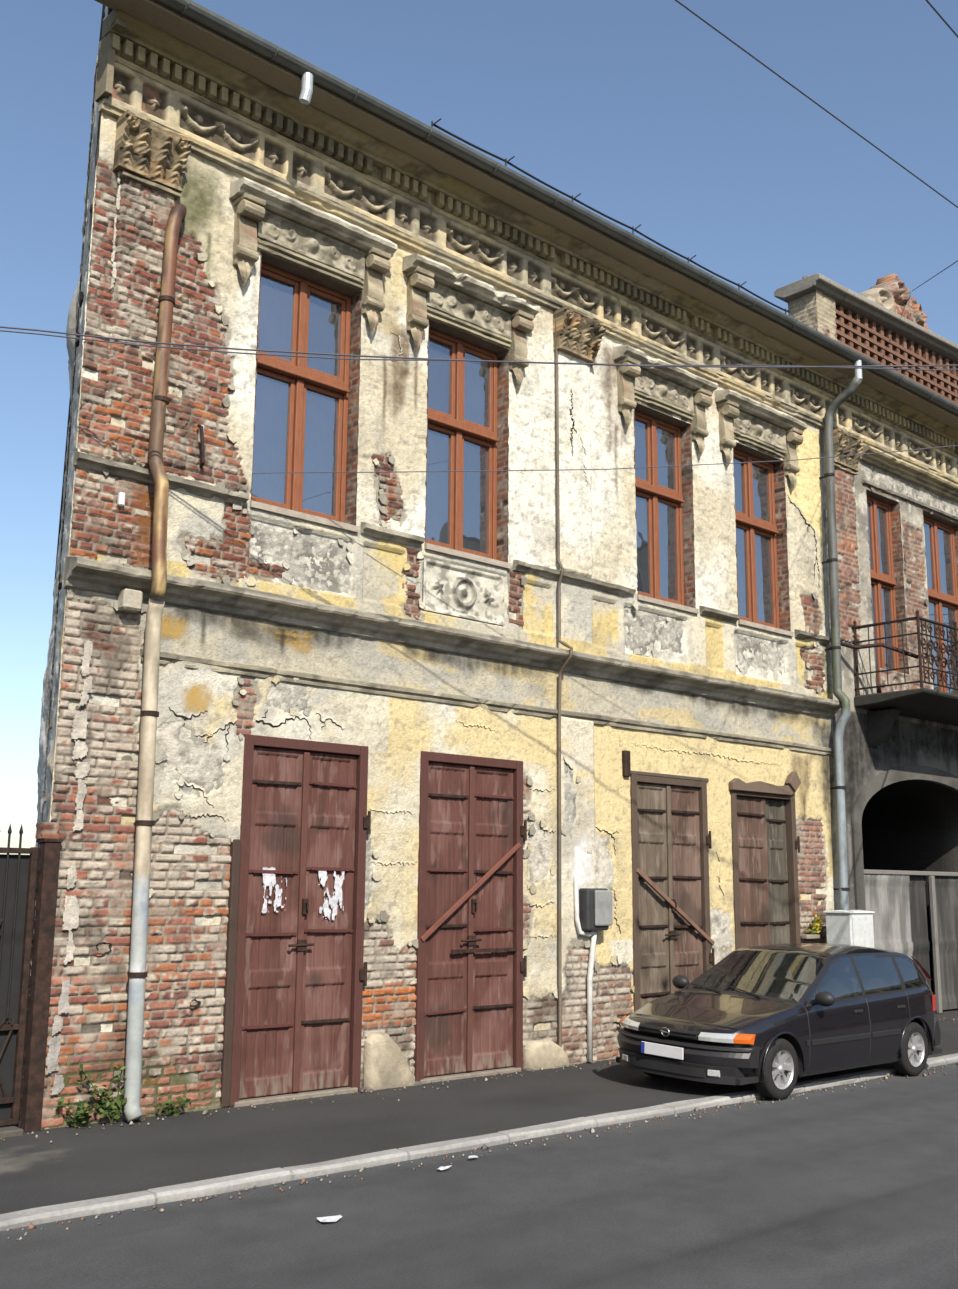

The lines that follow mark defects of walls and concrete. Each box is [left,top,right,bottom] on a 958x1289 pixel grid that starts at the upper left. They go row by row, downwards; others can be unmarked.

flaking render [371,453,403,528]
flaking render [40,65,355,1129]
flaking render [402,548,426,620]
flaking render [734,592,827,694]
flaking render [834,466,958,689]
crack [155,754,231,821]
crack [169,706,345,752]
flaking render [796,817,828,943]
flaking render [360,830,418,1089]
flaking render [523,942,634,1063]